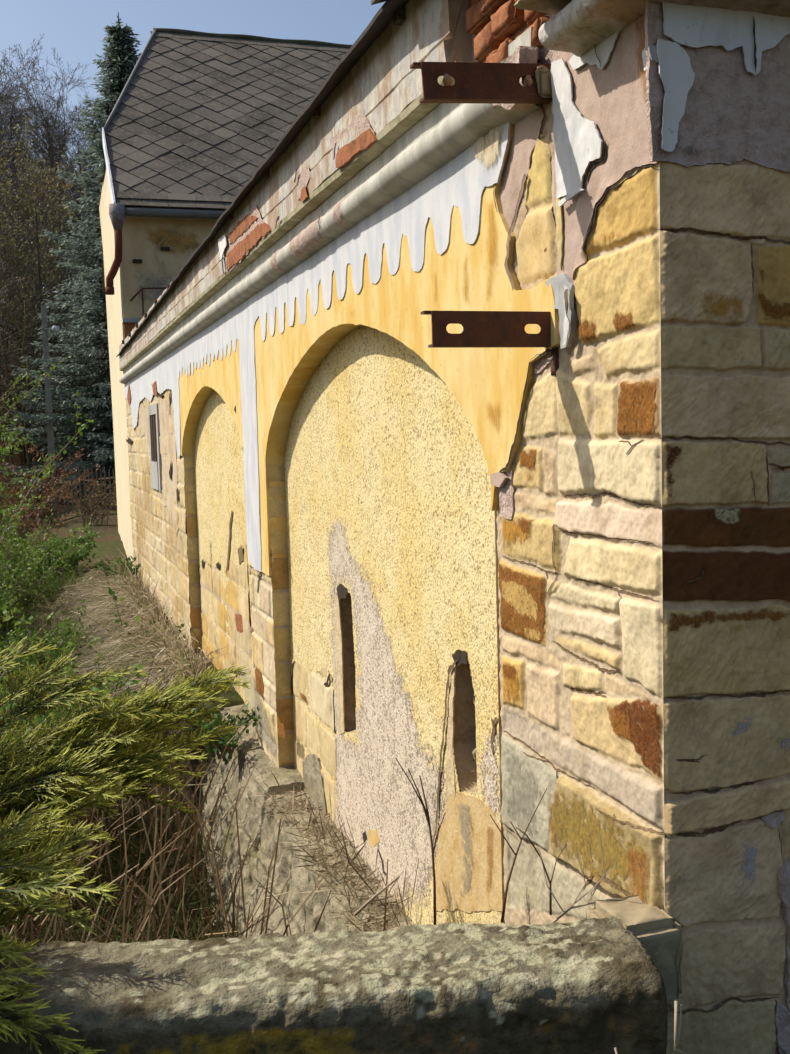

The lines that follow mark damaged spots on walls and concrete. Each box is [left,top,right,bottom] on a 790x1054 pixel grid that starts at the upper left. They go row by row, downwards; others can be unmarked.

flaking render [466,0,549,63]
spalling [330,113,378,168]
spalling [218,205,271,274]
spalling [491,0,790,520]
peeling [327,516,502,913]